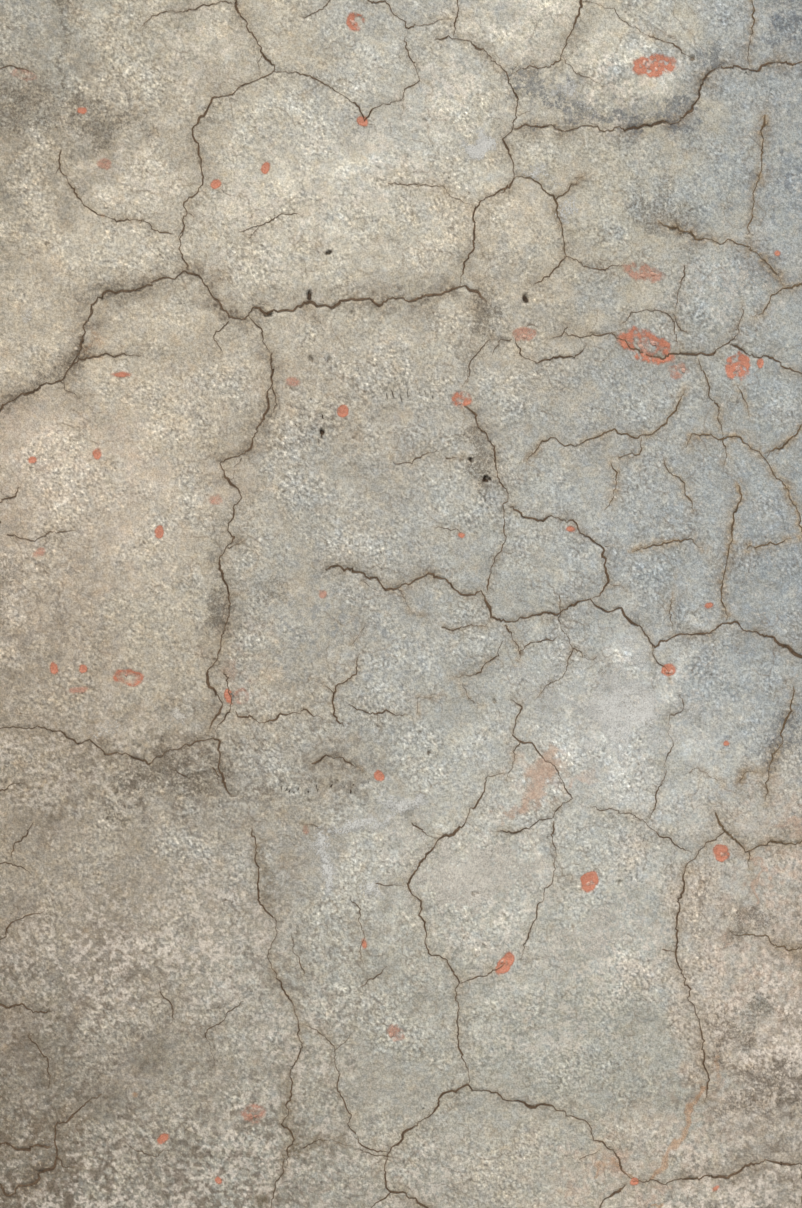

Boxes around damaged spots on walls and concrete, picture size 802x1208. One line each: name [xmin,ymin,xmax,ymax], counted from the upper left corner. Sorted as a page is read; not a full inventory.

crack [0,0,802,796]
crack [251,114,802,1208]
crack [0,823,33,873]
crack [1,911,44,939]
crack [0,1003,53,1087]
crack [205,1001,243,1071]
crack [0,1094,102,1196]